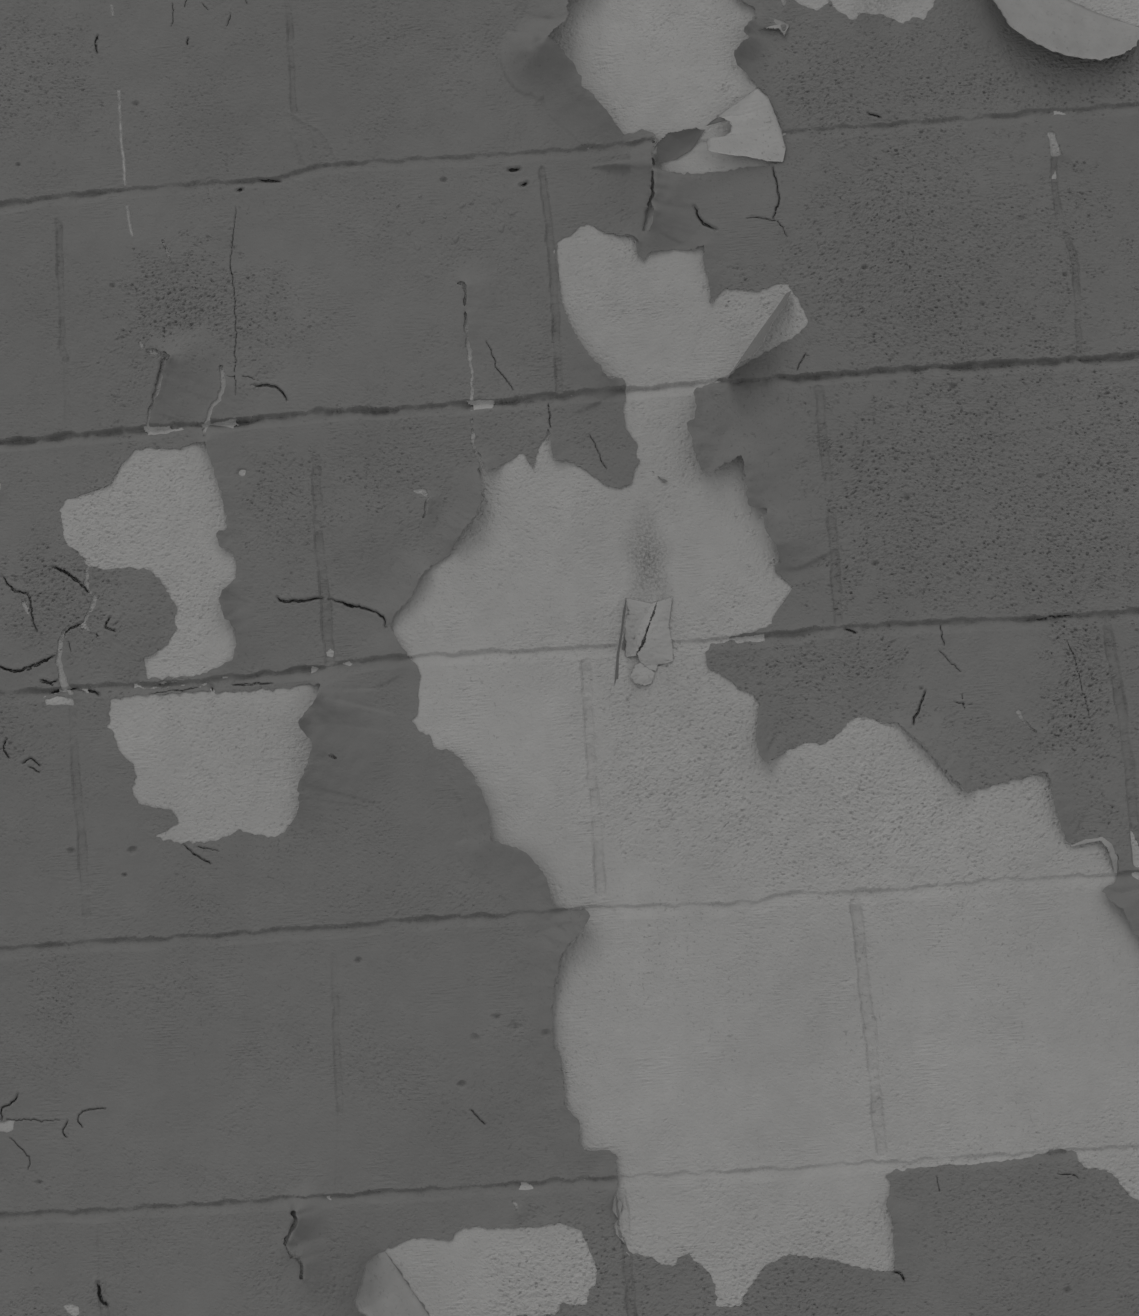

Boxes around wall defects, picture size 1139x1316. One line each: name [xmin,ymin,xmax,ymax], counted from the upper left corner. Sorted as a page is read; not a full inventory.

crack [0,578,114,695]
crack [54,567,90,593]
peeling [59,331,391,844]
peeling [354,0,1139,1316]
crack [1,1095,106,1168]